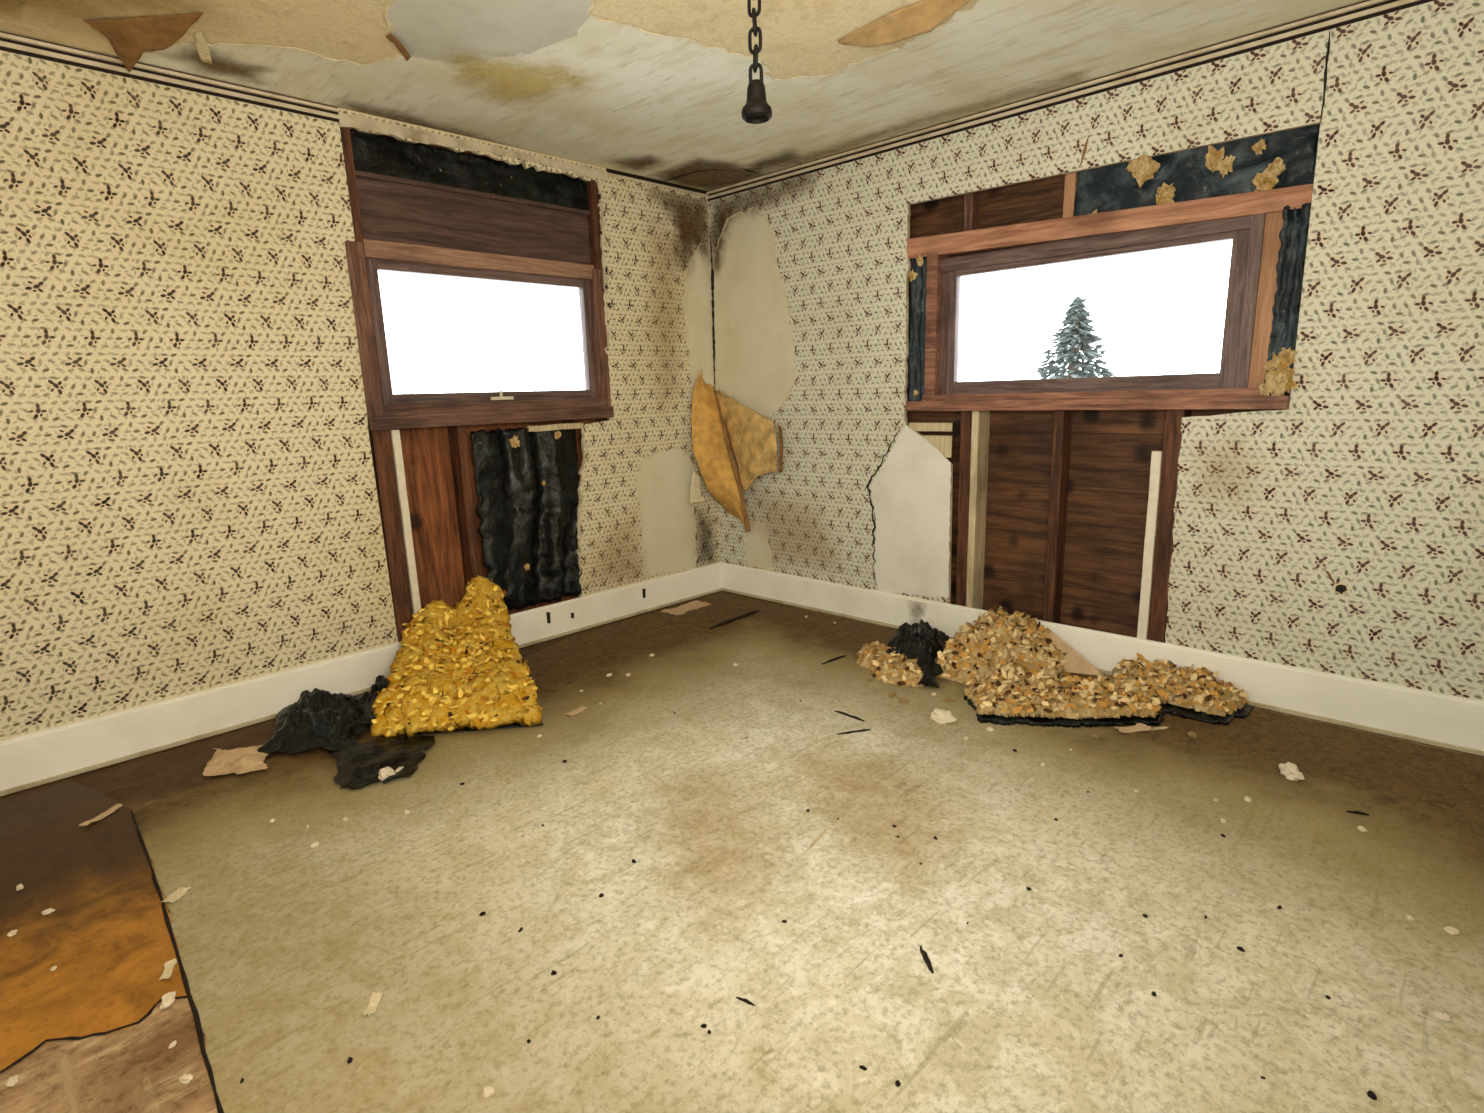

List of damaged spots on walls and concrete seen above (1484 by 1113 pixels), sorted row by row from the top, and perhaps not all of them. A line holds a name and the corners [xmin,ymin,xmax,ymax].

peeling [83,12,212,72]
peeling [385,33,411,61]
peeling [838,0,971,47]
spalling [338,112,610,354]
damp [617,154,802,268]